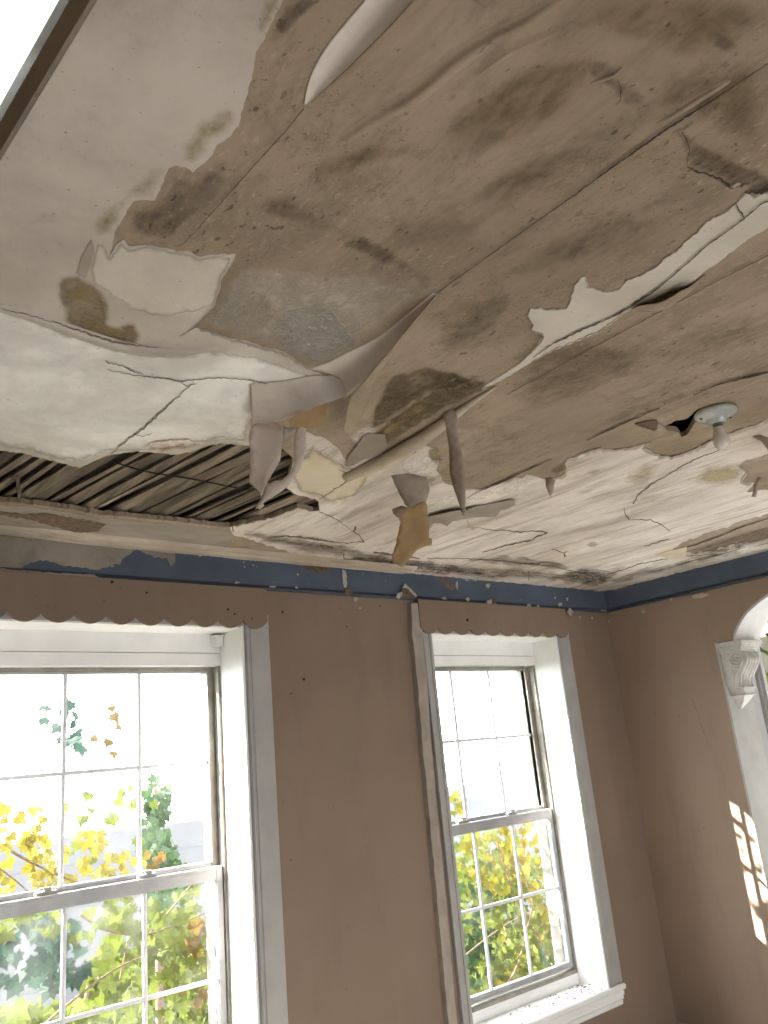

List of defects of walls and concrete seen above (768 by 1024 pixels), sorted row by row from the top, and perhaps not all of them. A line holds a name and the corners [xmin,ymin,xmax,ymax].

crack [437,63,768,395]
leakage [62,279,137,343]
crack [0,279,268,454]
flaking render [0,0,768,623]
leakage [374,370,484,442]
leakage [246,534,393,563]
crack [269,450,768,581]
leakage [406,529,768,584]